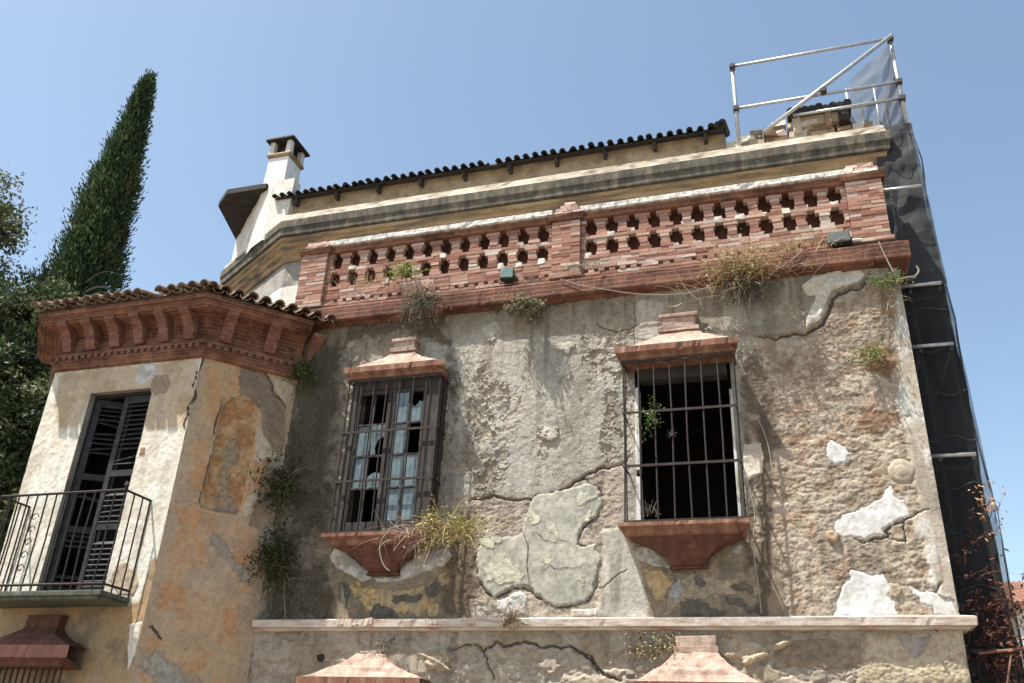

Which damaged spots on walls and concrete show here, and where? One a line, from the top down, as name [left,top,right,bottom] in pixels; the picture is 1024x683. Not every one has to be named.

flaking render [760,270,870,341]
crack [183,359,203,437]
spalling [238,368,296,464]
spalling [826,440,853,465]
crack [470,463,624,502]
spalling [825,486,925,545]
peeling [330,547,452,619]
spalling [496,590,528,616]
peeling [632,543,762,617]
spalling [831,570,960,616]
flaking render [127,622,142,670]
crack [450,640,622,681]